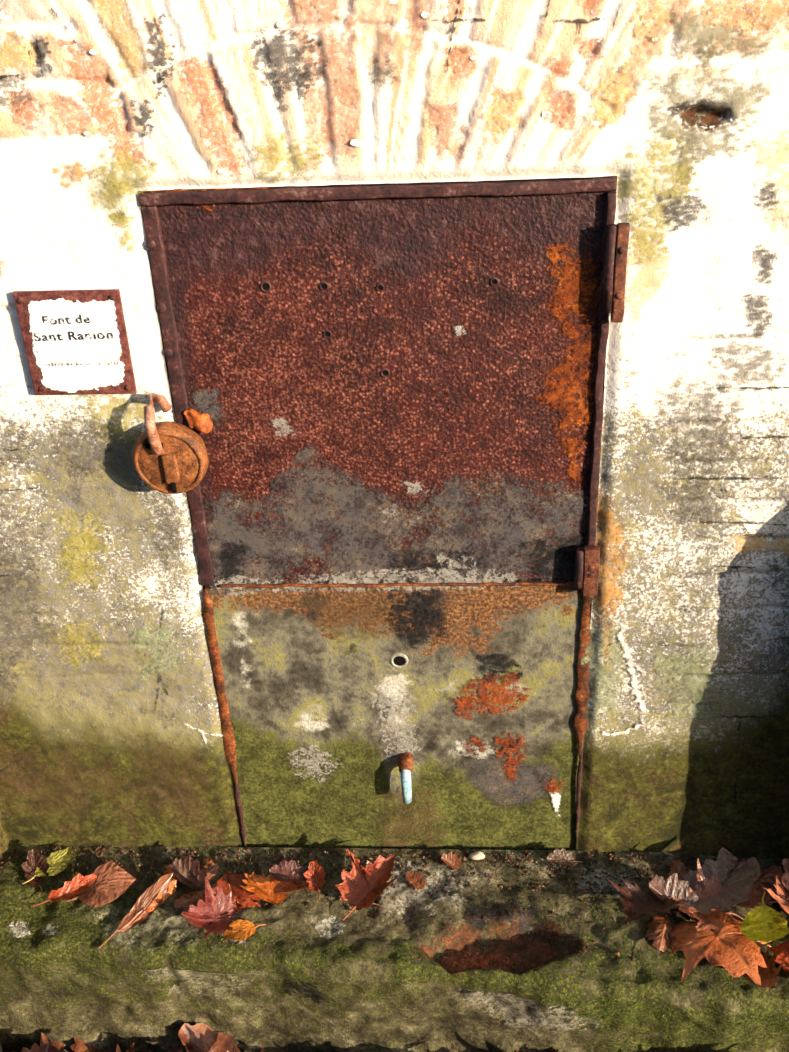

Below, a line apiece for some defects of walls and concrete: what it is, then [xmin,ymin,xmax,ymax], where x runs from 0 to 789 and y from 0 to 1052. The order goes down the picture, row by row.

mould [251,28,328,111]
corrosion [536,240,602,481]
leakage [655,244,787,524]
leakage [50,418,127,505]
leakage [0,416,57,709]
leakage [144,491,194,565]
corrosion [591,490,629,669]
corrosion [451,672,533,720]
efflorescence [602,622,646,736]
corrosion [463,732,528,781]